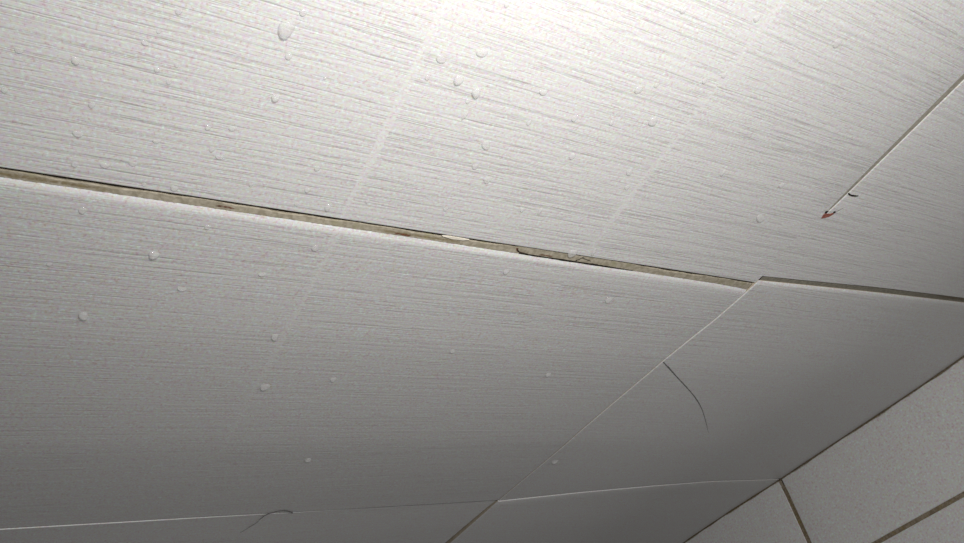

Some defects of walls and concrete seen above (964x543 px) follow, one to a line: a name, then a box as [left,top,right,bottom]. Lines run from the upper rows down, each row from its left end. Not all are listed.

crack [663,362,708,429]